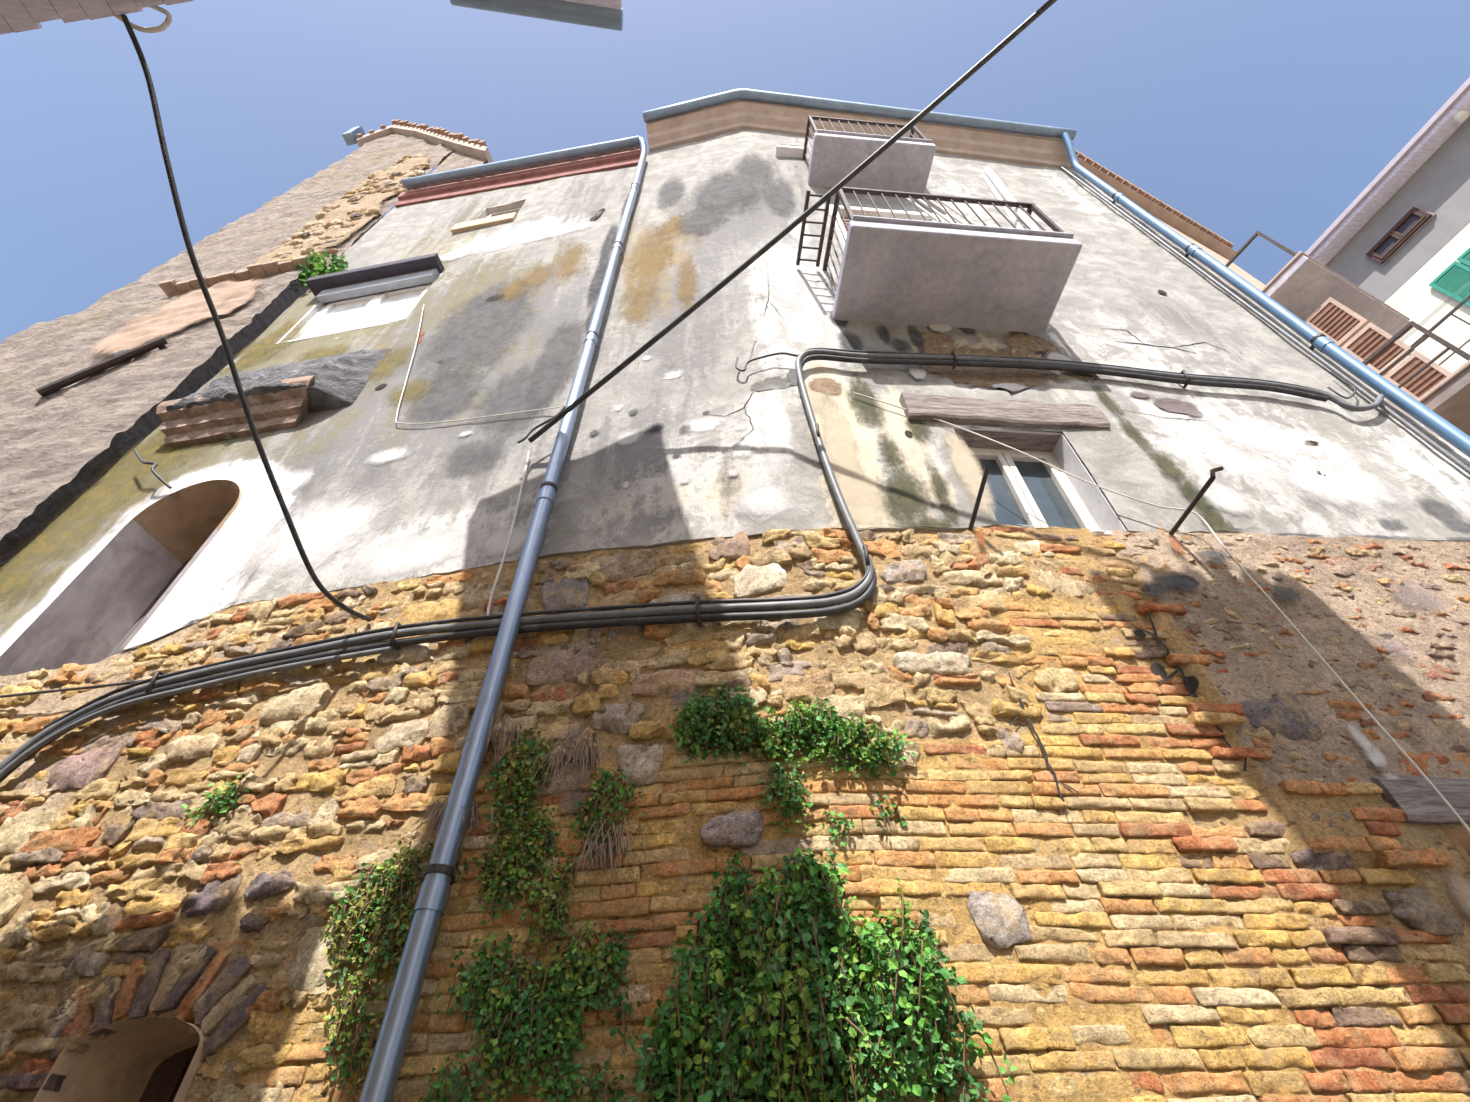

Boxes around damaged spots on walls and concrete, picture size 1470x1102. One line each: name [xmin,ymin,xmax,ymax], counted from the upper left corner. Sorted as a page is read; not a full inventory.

spalling [253,154,430,264]
water stain [659,180,683,206]
water stain [390,195,629,475]
crack [706,244,781,443]
spalling [909,324,1100,391]
crack [1104,328,1230,354]
water stain [279,470,313,493]
water stain [369,448,406,463]
water stain [686,417,723,431]
water stain [906,420,931,442]
water stain [881,465,958,528]
water stain [254,495,529,578]